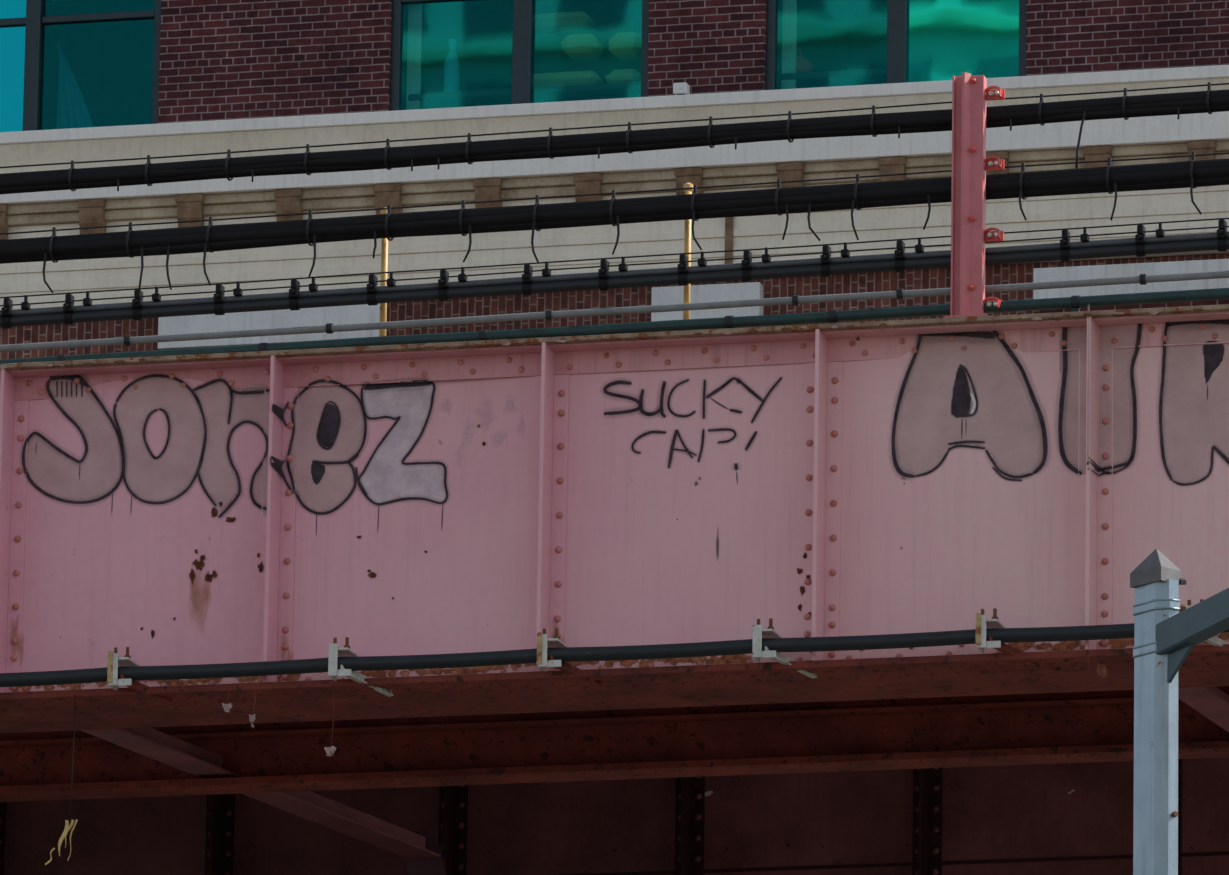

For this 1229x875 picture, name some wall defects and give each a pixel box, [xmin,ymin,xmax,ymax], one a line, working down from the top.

rust [189,549,217,610]
rust [797,552,811,615]
rust [1008,638,1134,652]